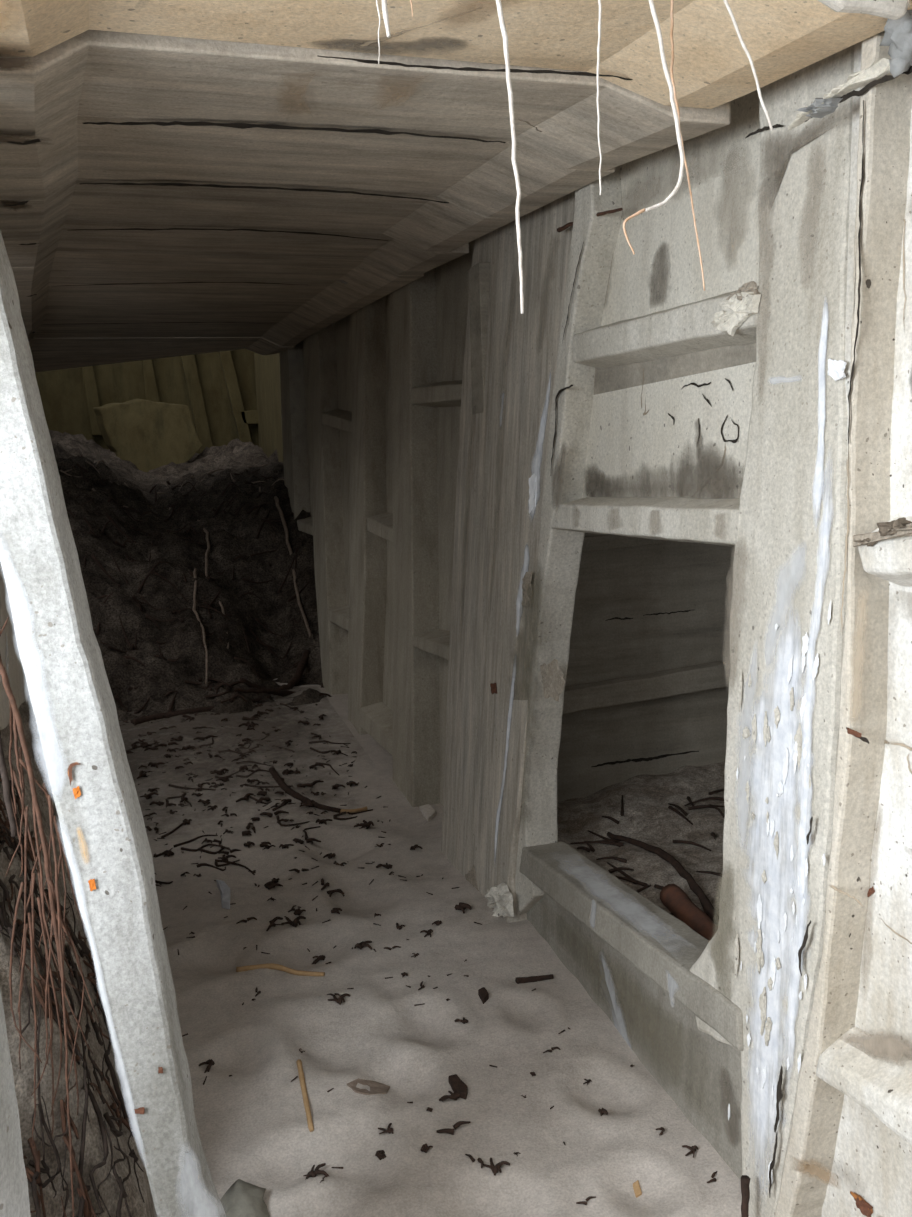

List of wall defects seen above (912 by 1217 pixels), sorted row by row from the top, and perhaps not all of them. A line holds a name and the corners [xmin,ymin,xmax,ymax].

crack [745,117,813,138]
crack [839,66,912,626]
water stain [586,434,734,532]
spalling [853,517,912,547]
peeling [733,304,847,1182]
crack [846,727,912,774]
rust [68,762,81,799]
spalling [846,1033,912,1063]